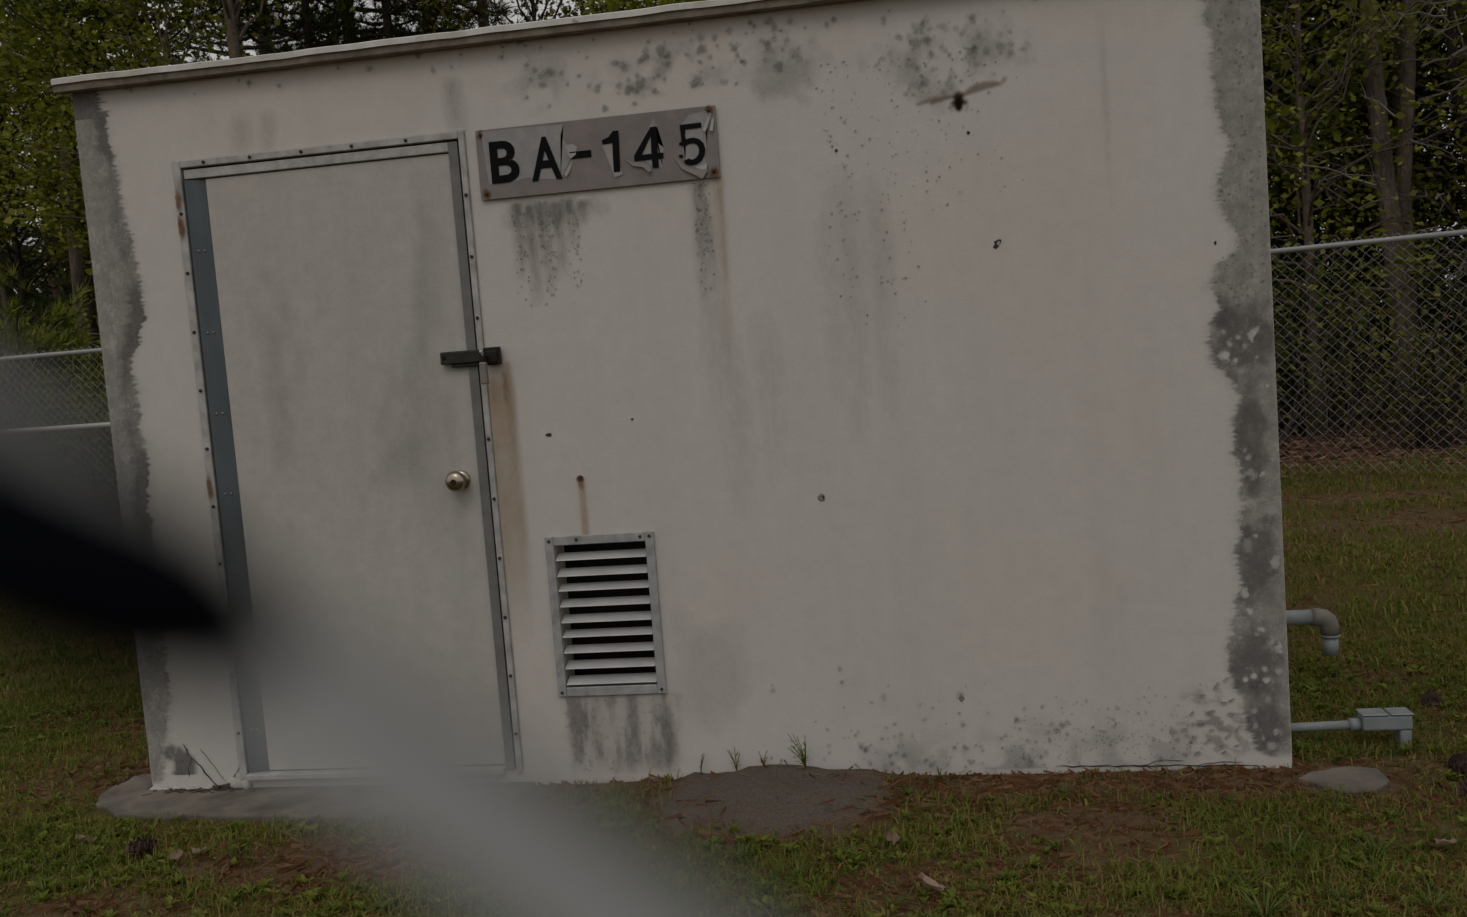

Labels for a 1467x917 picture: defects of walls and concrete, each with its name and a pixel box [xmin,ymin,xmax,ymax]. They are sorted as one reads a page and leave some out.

damp [72,91,149,481]
damp [1203,0,1292,754]
corrosion [577,476,587,535]
damp [141,692,194,781]
damp [566,693,674,763]